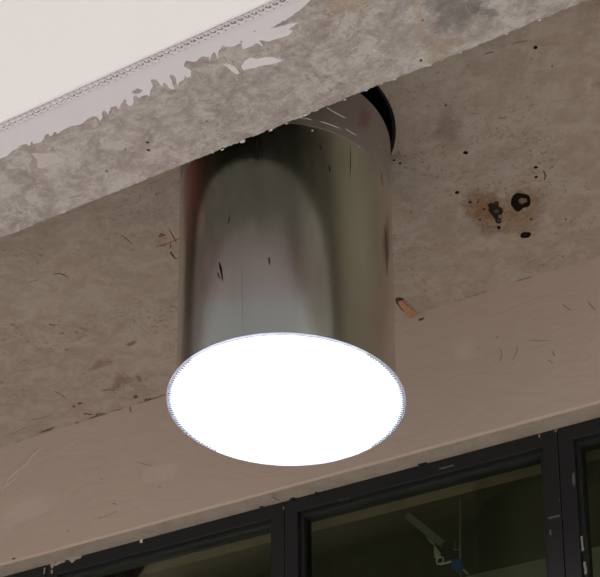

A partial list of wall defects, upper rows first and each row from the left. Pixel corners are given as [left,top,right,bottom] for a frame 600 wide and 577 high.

peeling [0,0,310,158]